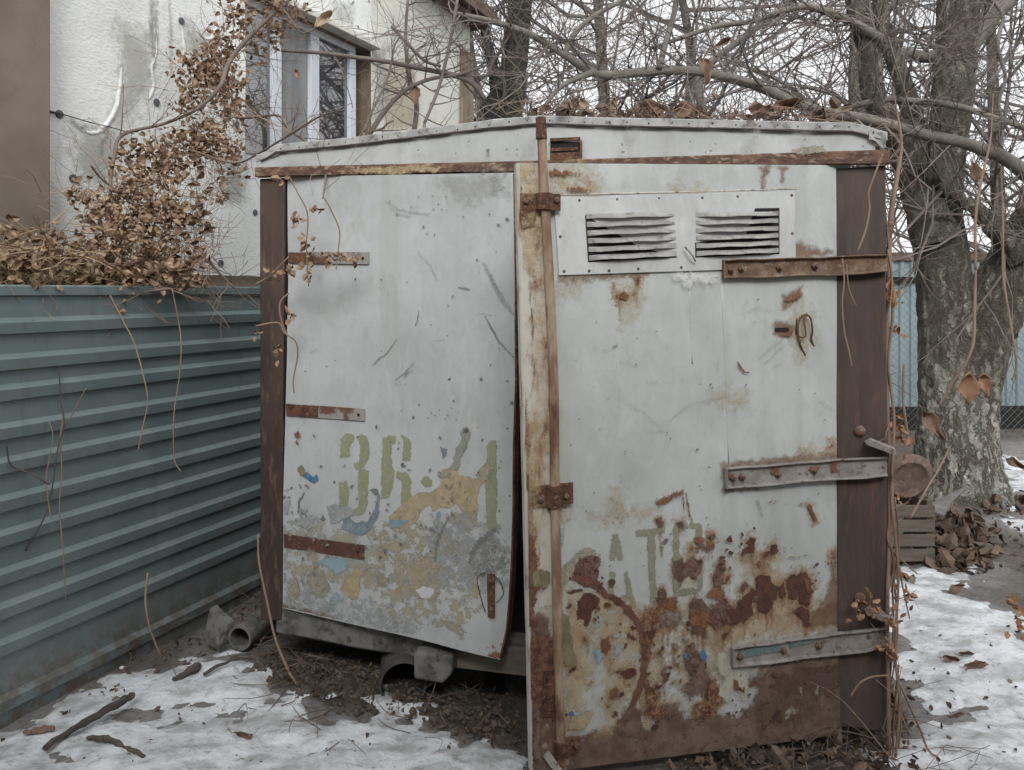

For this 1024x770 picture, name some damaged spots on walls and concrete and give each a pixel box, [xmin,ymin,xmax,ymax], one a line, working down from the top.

rust [520,160,596,266]
rust [561,272,647,312]
peeling [283,426,511,640]
rust [525,394,842,770]